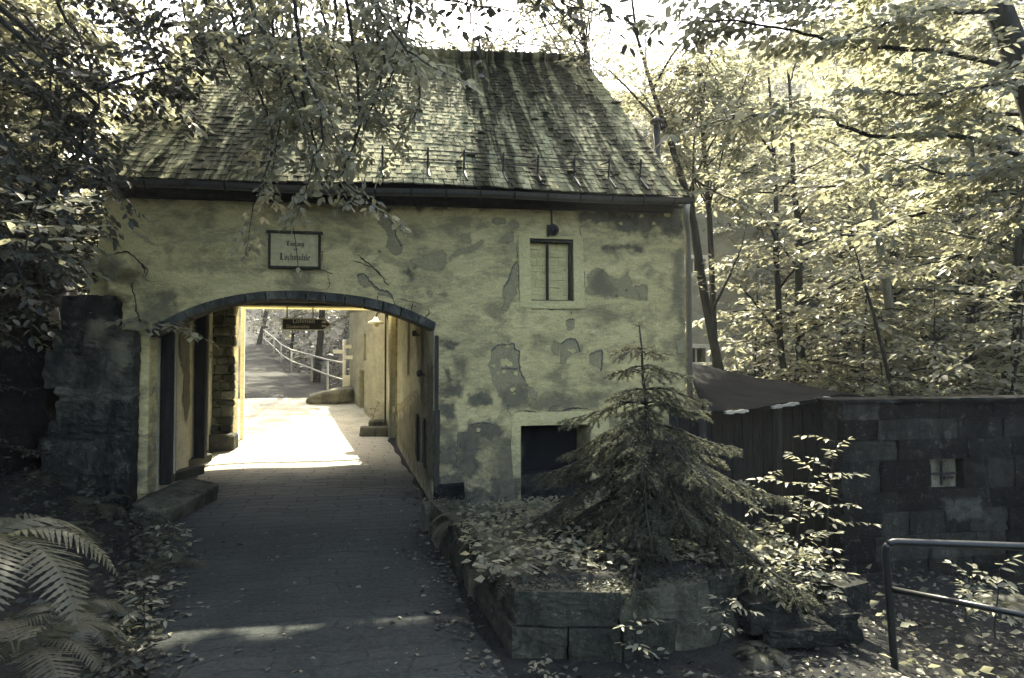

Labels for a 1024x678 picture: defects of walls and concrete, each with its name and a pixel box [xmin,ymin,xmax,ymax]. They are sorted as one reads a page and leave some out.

peeling [375,208,484,278]
crack [109,251,155,331]
crack [322,251,431,342]
peeling [502,261,518,311]
peeling [586,268,648,300]
spalling [439,340,537,409]
spalling [552,318,603,371]